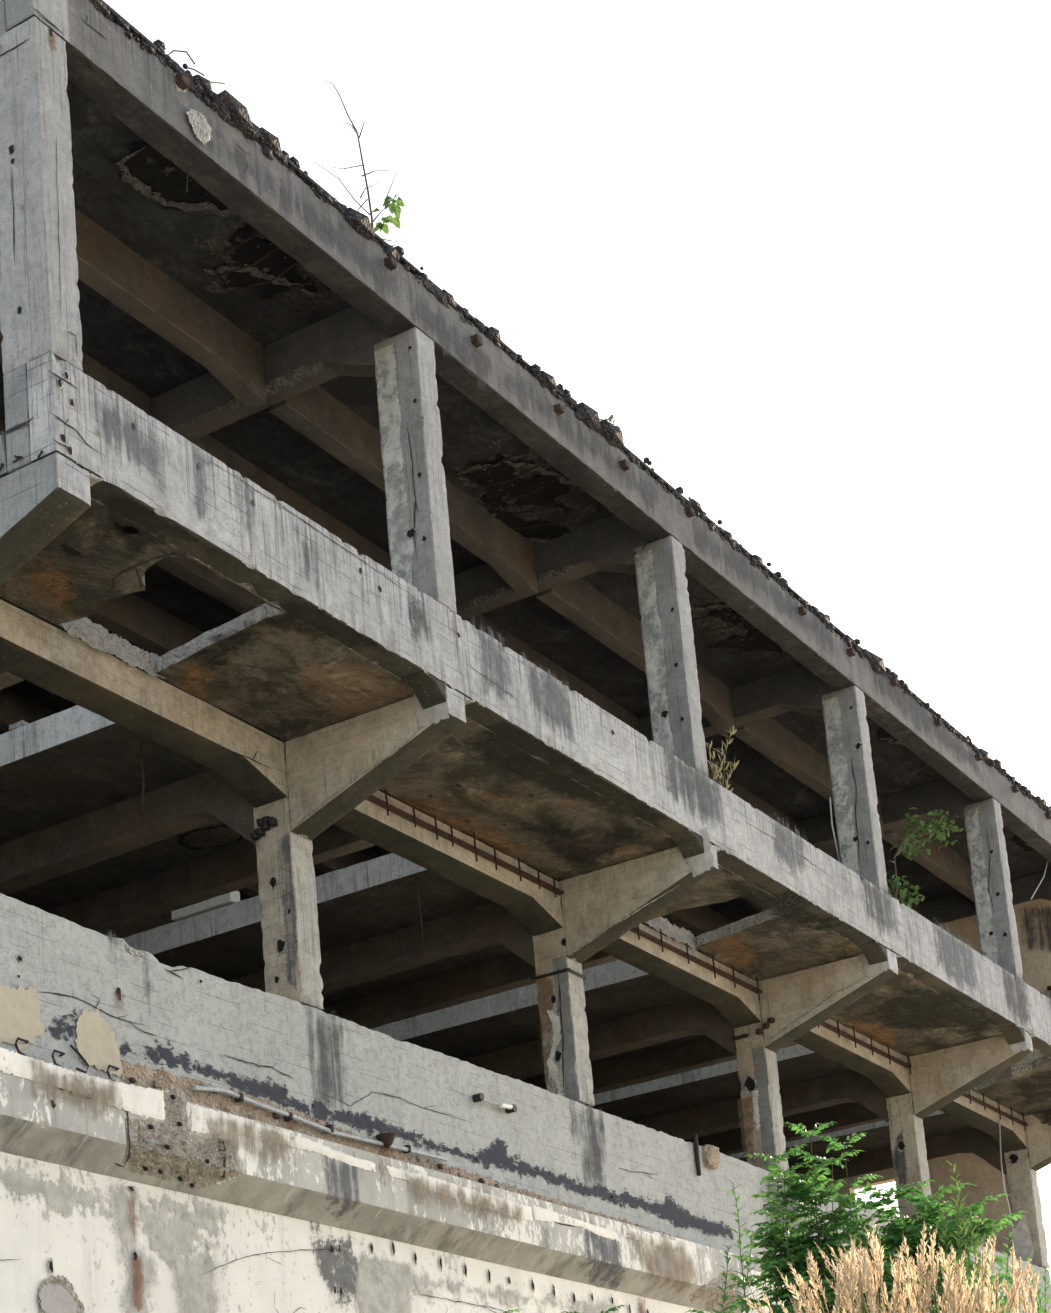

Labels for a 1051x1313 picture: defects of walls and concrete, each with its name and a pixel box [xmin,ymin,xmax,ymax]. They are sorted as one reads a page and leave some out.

peeling [186,109,212,145]
spalling [61,617,165,679]
leakage [181,603,385,698]
leakage [1024,907,1051,952]
crack [43,992,158,1036]
leakage [309,1016,343,1104]
flaking render [546,995,564,1096]
leakage [1014,1070,1051,1126]
leakage [572,1108,604,1184]
spalling [0,1043,684,1313]
leakage [325,1158,359,1218]
corrosion [133,1258,144,1310]